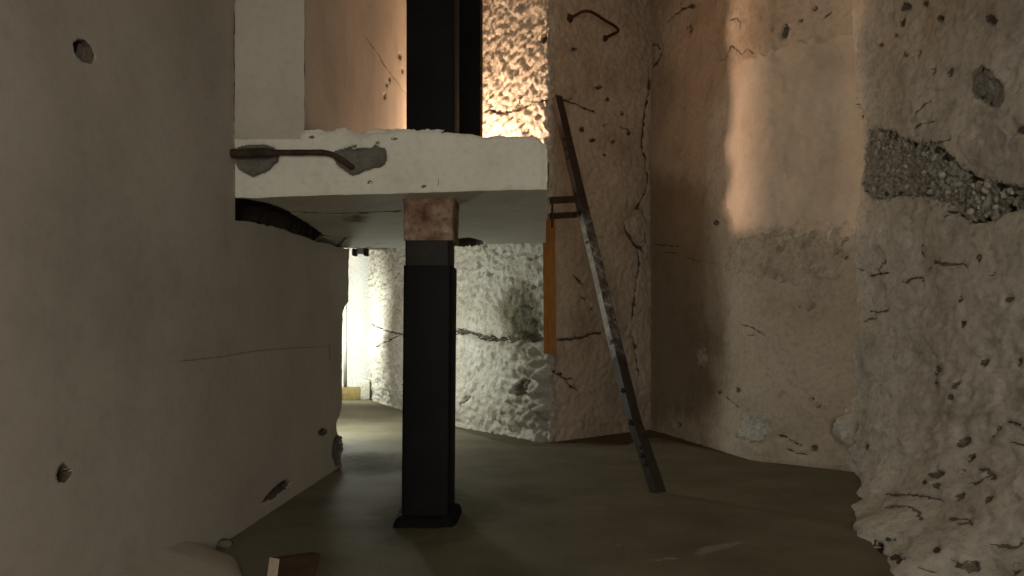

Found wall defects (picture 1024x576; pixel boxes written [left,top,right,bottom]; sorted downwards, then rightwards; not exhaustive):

crack [721,18,754,63]
spalling [971,64,1006,109]
crack [487,43,662,211]
spalling [235,144,278,178]
spalling [333,137,399,184]
spalling [861,100,1024,224]
crack [456,275,602,343]
crack [631,244,700,375]
spalling [263,480,290,502]